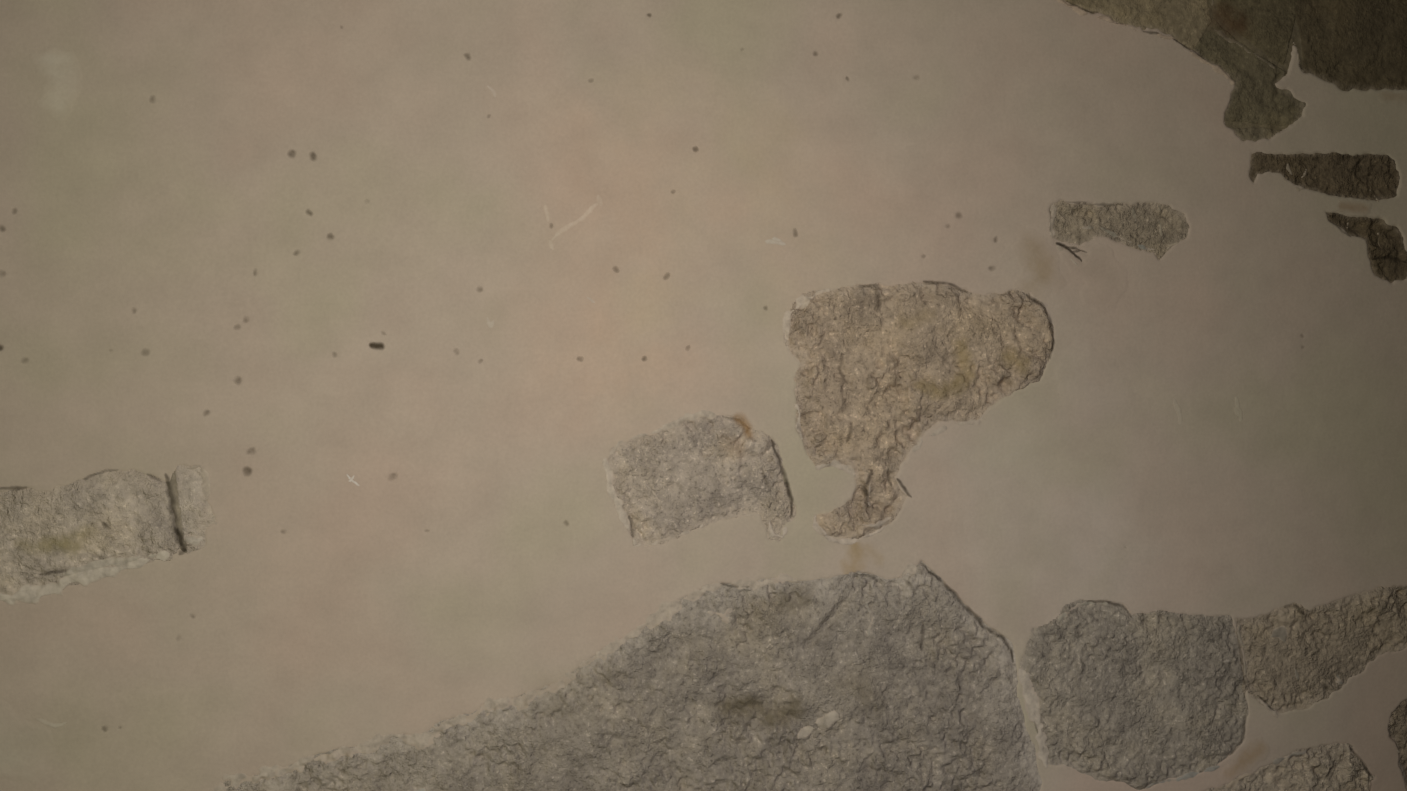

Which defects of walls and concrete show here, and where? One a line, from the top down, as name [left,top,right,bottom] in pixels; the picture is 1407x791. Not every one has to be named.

peeling [1049,0,1407,283]
peeling [0,465,217,606]
peeling [602,410,796,547]
peeling [782,280,1054,545]
peeling [211,561,1407,791]